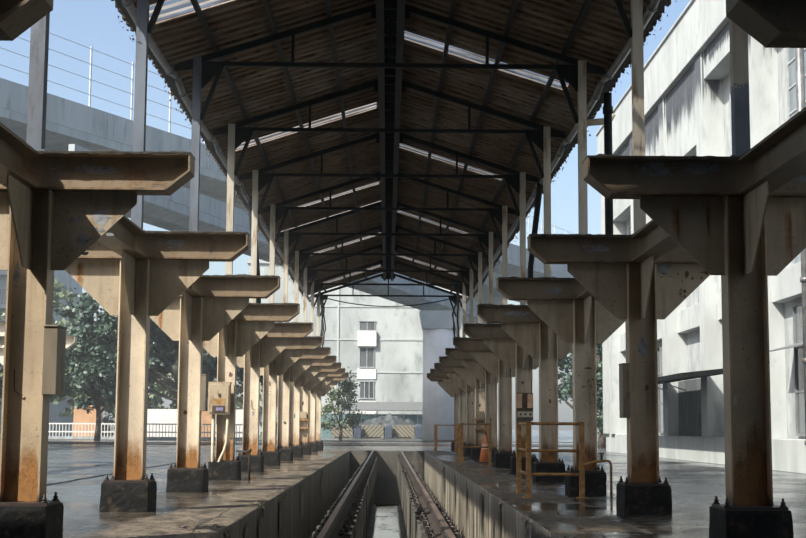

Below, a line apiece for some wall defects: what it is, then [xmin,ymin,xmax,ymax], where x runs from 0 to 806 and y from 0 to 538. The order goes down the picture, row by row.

leakage [645,22,729,151]
rust [4,457,38,502]
rust [116,452,141,480]
rust [178,450,197,468]
rust [632,459,656,482]
rust [734,434,767,506]